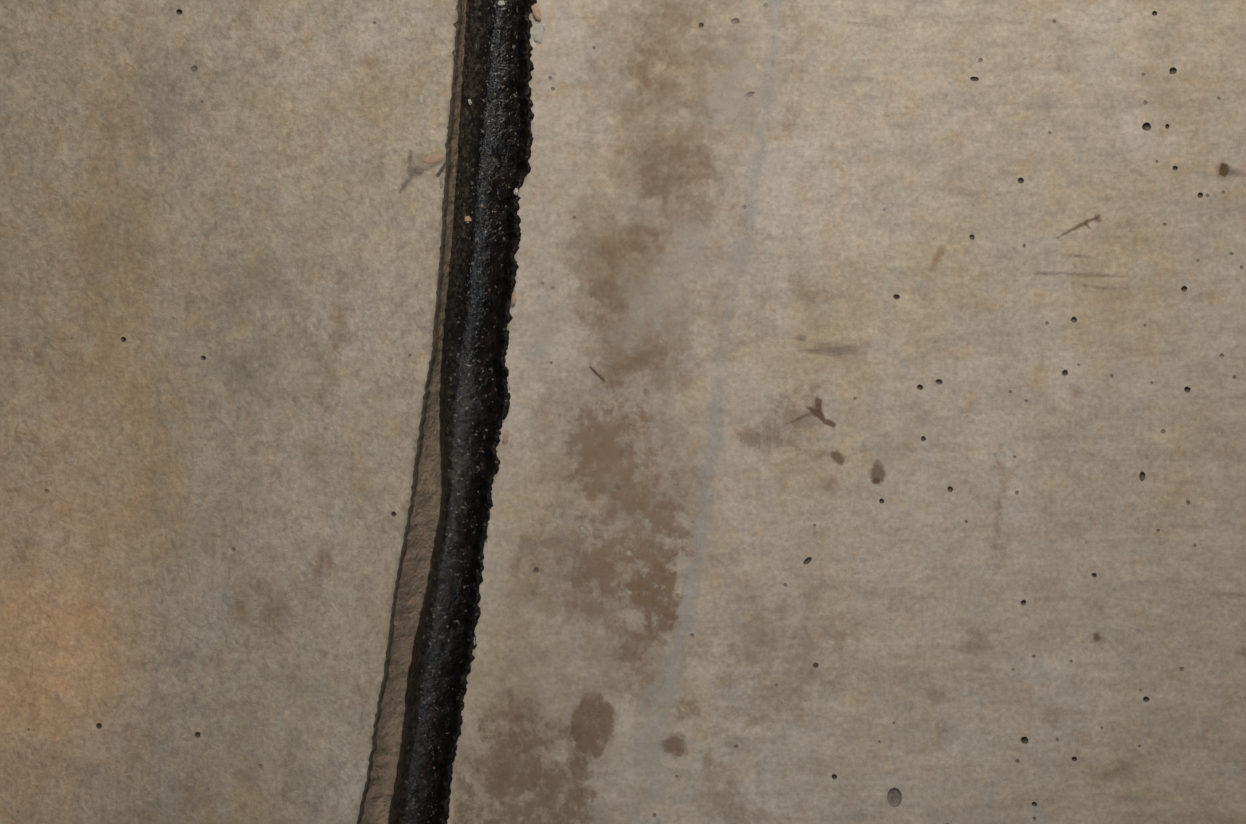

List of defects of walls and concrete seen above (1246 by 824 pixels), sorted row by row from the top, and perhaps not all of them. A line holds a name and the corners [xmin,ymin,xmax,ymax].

crack [356,0,466,824]
leakage [572,694,613,758]